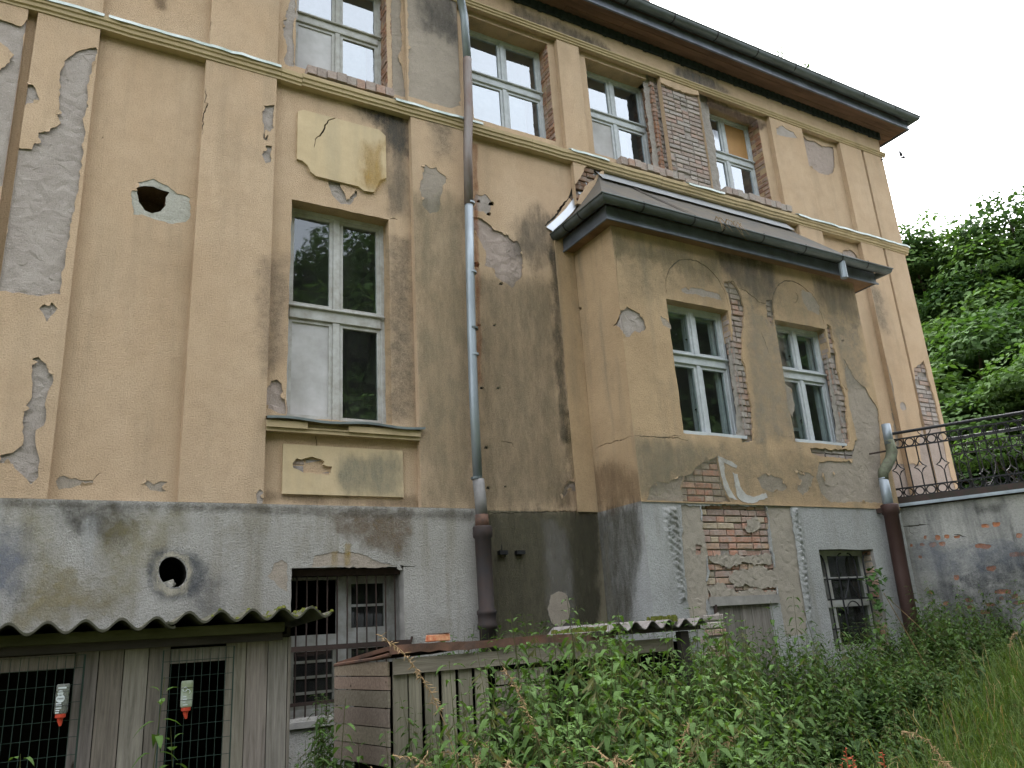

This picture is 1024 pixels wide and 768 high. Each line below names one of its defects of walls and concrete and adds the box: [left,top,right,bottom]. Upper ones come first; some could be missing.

peeling [0,357,54,484]
peeling [0,20,97,321]
peeling [131,179,191,224]
flaking render [293,459,329,473]
peeling [473,194,524,288]
damp [505,214,560,339]
damp [529,325,571,440]
peeling [614,307,646,337]
peeling [756,326,955,503]
damp [149,551,206,597]
damp [488,458,640,636]
flaking render [681,457,807,637]